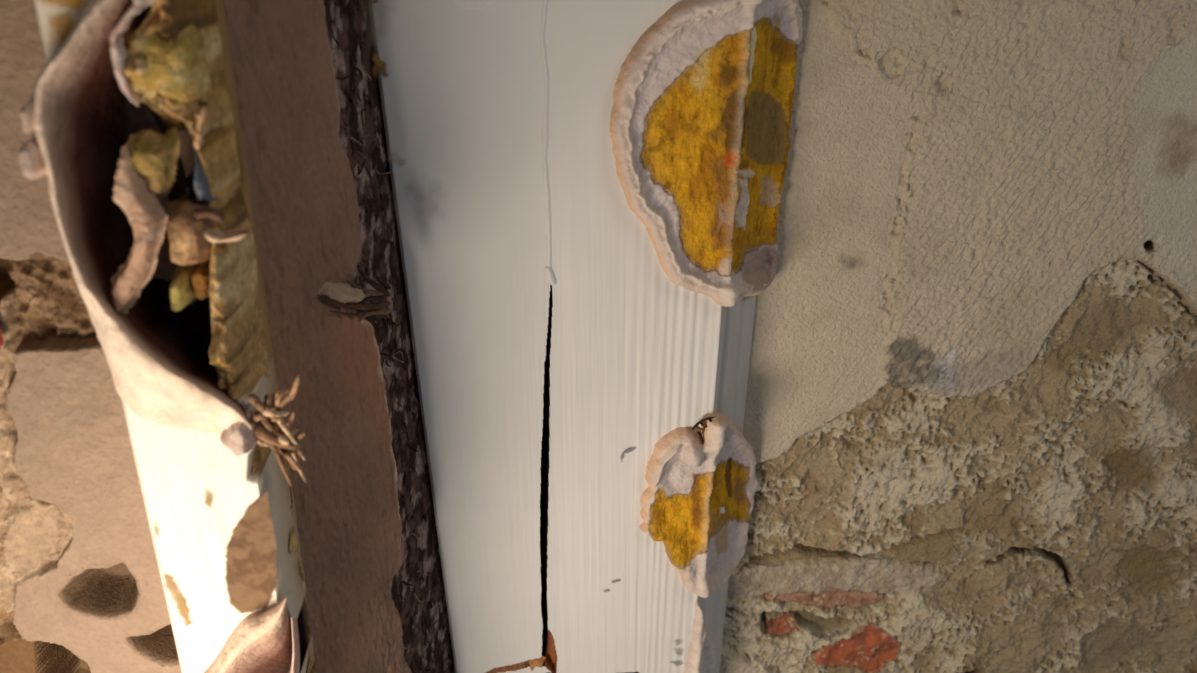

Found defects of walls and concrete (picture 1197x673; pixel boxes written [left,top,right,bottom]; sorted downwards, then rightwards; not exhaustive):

spalling [0,258,16,349]
crack [486,285,553,673]
spalling [721,238,1197,673]
peeling [165,575,191,626]
hole [0,637,91,673]